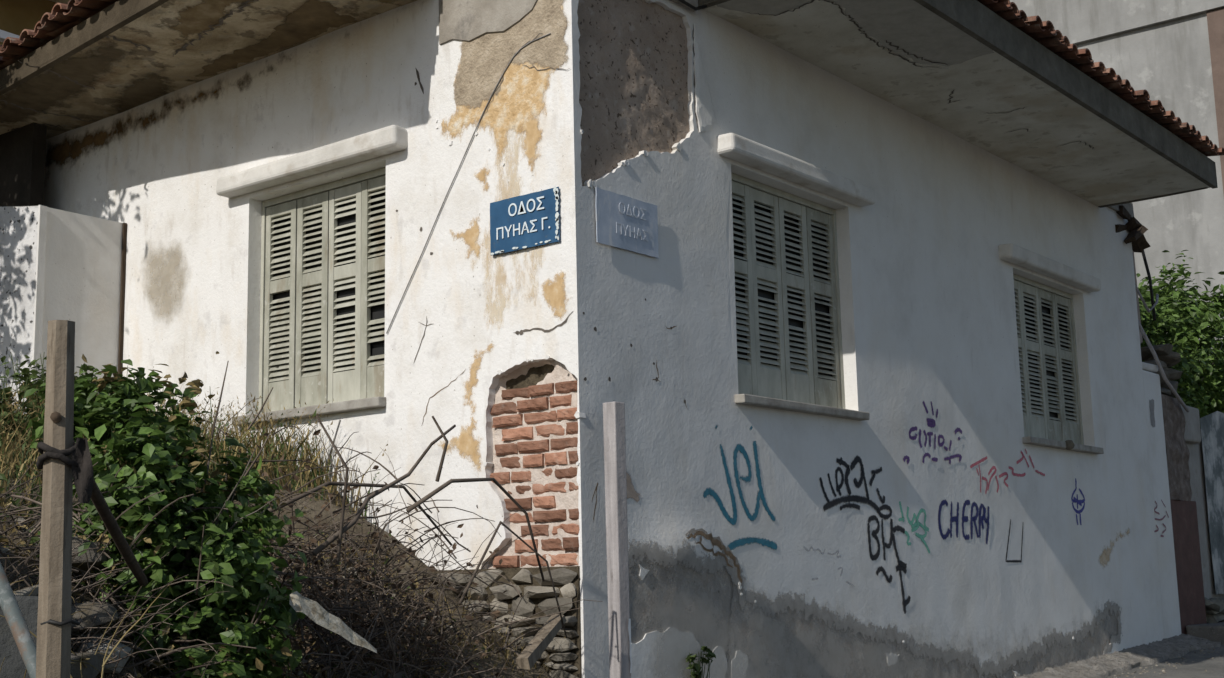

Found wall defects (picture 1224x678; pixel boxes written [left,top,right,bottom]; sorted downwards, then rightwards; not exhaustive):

water stain [112,69,171,116]
spalling [435,0,716,190]
crack [747,0,1029,133]
water stain [149,252,183,315]
peeling [452,219,480,257]
peeling [543,272,566,318]
flaking render [442,343,587,569]
peeling [628,539,1122,678]